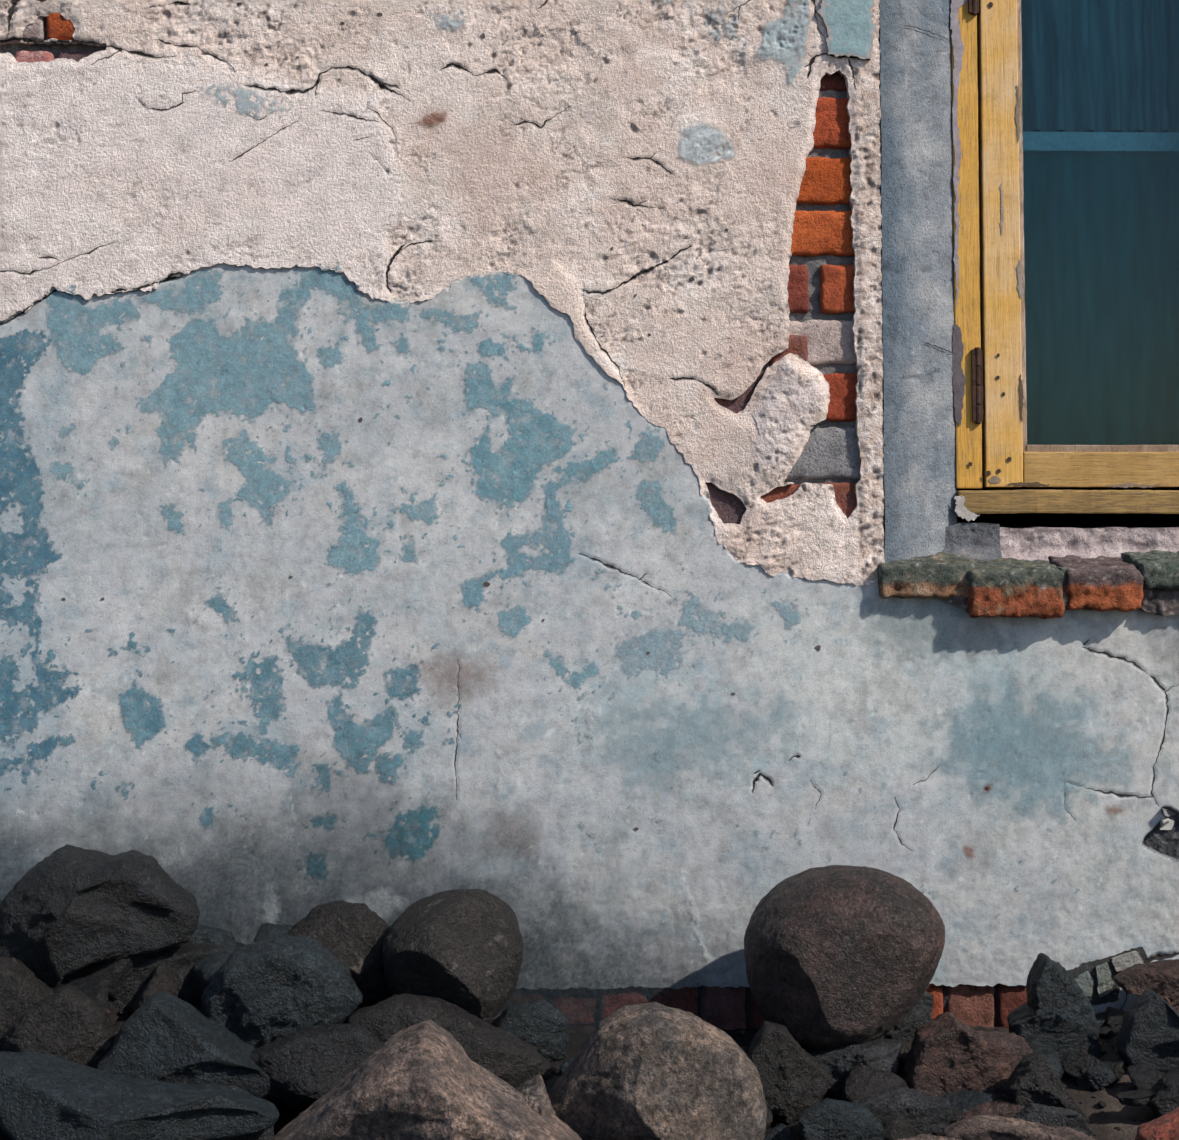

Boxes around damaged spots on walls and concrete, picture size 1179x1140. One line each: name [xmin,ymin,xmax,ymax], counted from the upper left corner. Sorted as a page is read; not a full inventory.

crack [0,0,410,174]
crack [441,62,507,80]
flaking render [692,0,876,93]
crack [0,242,114,325]
crack [111,271,191,293]
crack [386,240,437,292]
flaking render [714,72,861,519]
peeling [0,252,760,798]
peeling [763,589,810,645]
crack [1064,640,1179,819]
peeling [364,791,444,873]
flaking render [1143,808,1179,859]